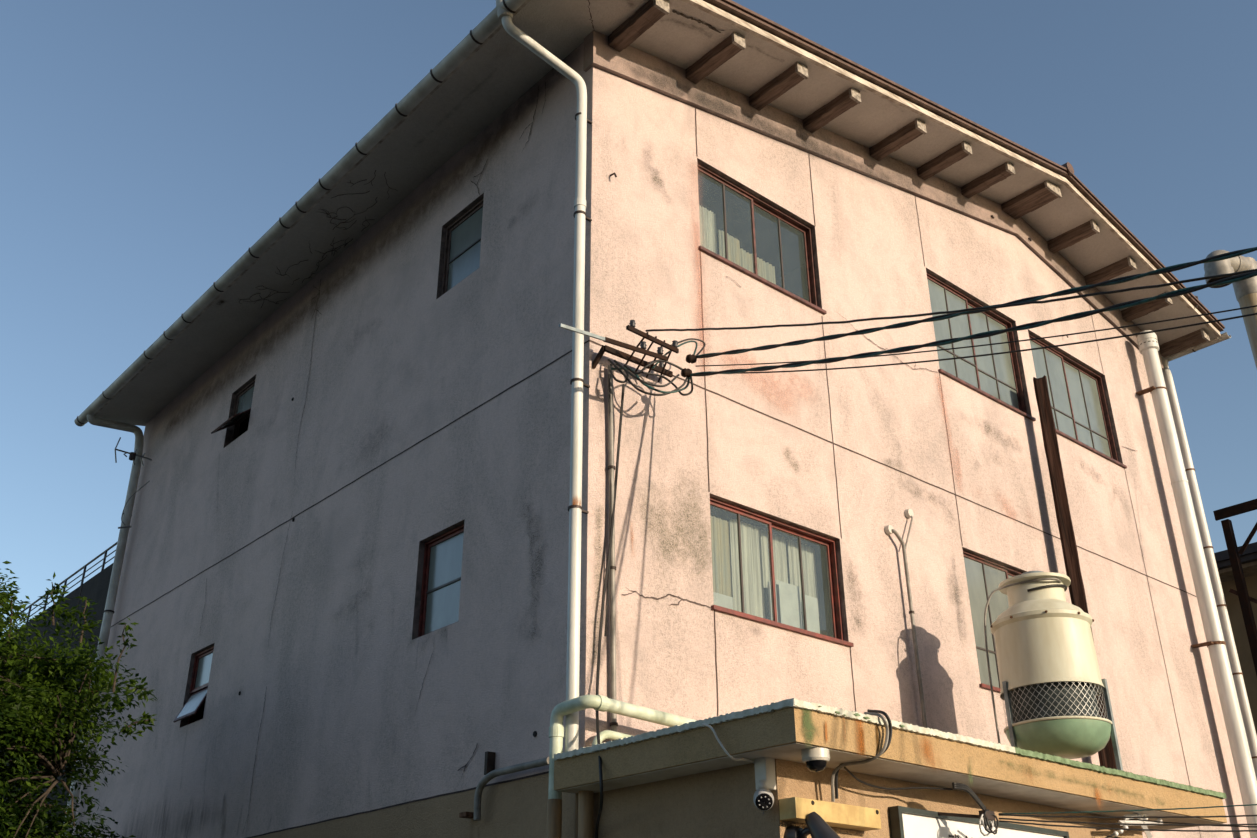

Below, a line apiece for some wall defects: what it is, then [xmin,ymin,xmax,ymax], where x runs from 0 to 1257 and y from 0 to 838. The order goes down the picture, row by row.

crack [838,313,938,373]
crack [622,588,711,608]
rust [859,720,879,754]